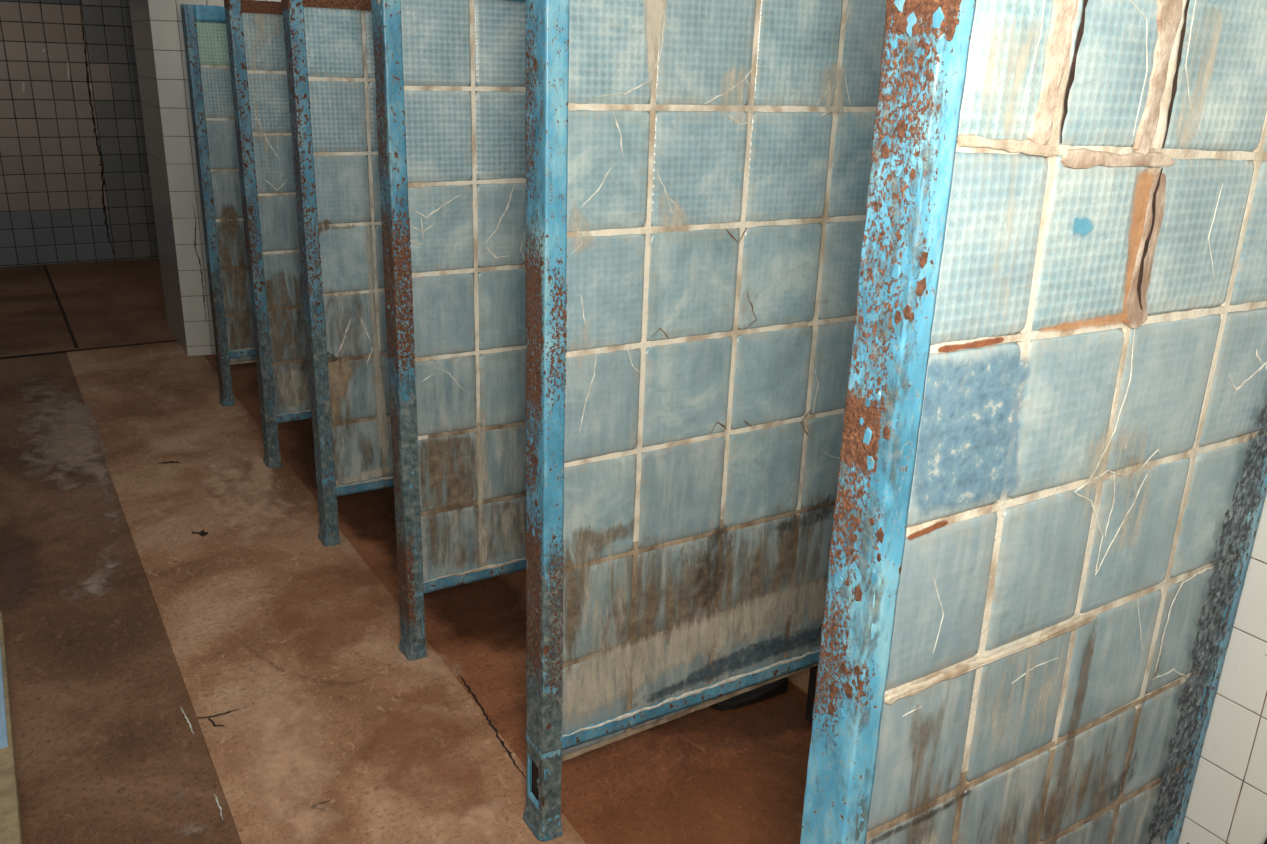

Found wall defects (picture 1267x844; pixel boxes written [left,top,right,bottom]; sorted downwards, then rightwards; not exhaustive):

crack [79,1,115,255]
crack [988,0,1045,120]
crack [1060,0,1088,143]
damp [21,379,116,517]
rust [224,0,418,636]
rust [525,0,568,730]
rust [788,0,962,755]
crack [1074,0,1203,575]
damp [562,577,827,737]